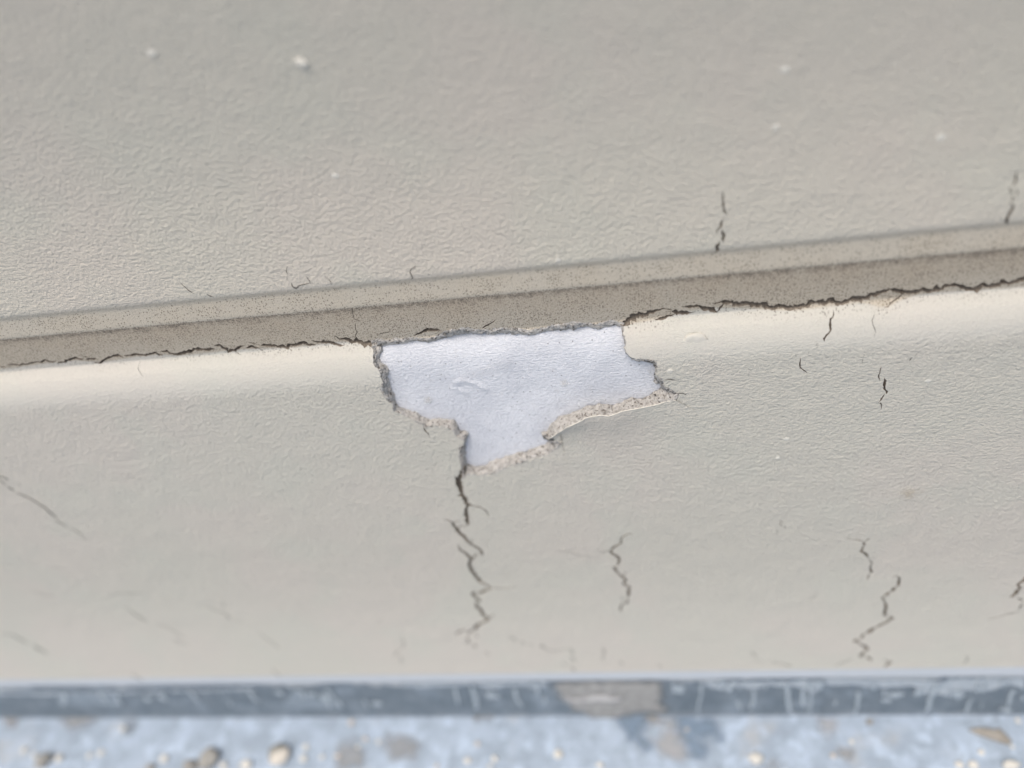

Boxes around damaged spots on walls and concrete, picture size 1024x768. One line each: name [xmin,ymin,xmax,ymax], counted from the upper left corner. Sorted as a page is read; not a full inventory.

crack [714,193,727,253]
crack [1005,171,1018,224]
crack [0,309,388,375]
crack [415,317,441,336]
crack [620,277,1024,372]
peeling [371,320,697,485]
crack [862,354,917,408]
crack [444,467,511,655]
crack [599,534,632,610]
crack [849,538,901,667]